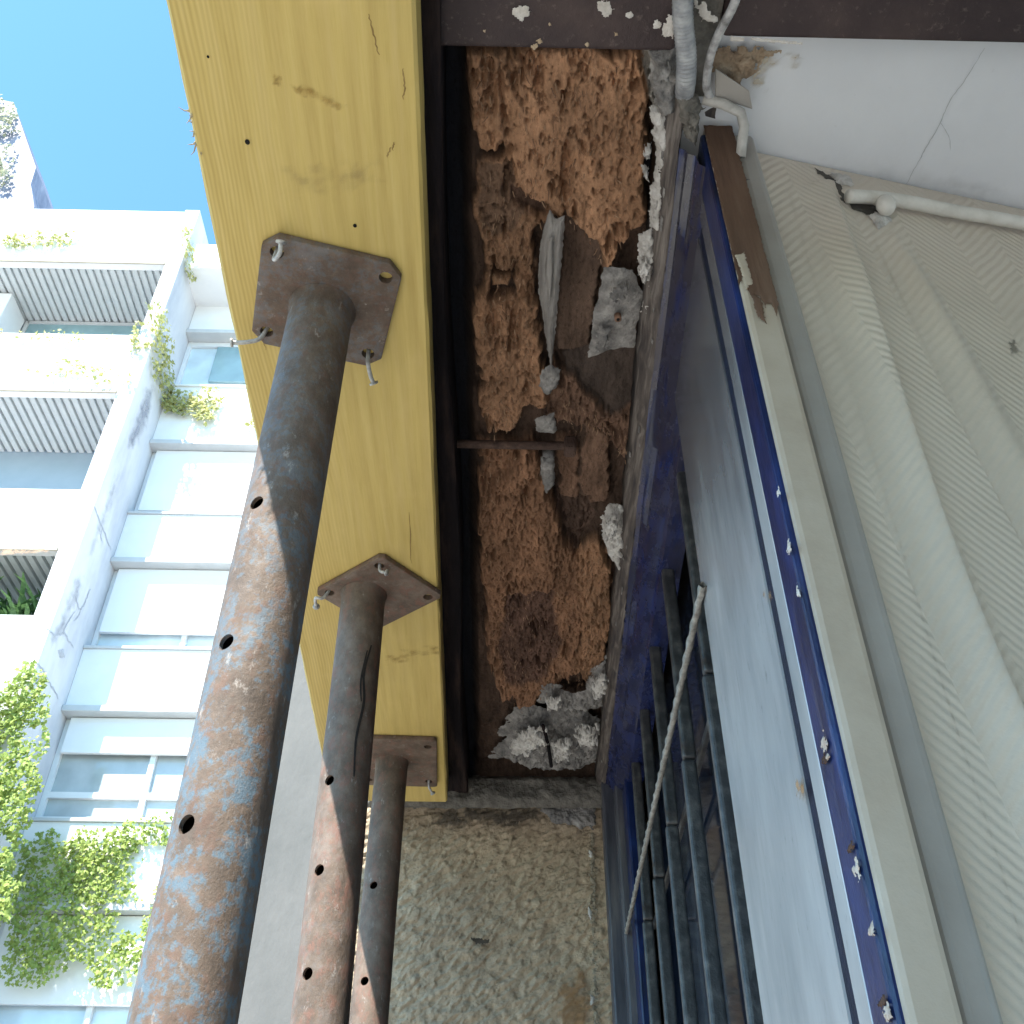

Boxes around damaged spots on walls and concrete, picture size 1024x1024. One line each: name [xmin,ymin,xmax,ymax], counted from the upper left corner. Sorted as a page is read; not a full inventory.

peeling [512,5,530,21]
peeling [597,0,612,18]
peeling [694,0,718,23]
crack [906,48,985,184]
peeling [587,14,779,357]
spalling [814,167,892,230]
flaking render [538,364,561,395]
flaking render [535,412,557,433]
flaking render [600,503,627,570]
flaking render [488,655,609,771]
peeling [846,840,861,882]
peeling [877,994,893,1023]